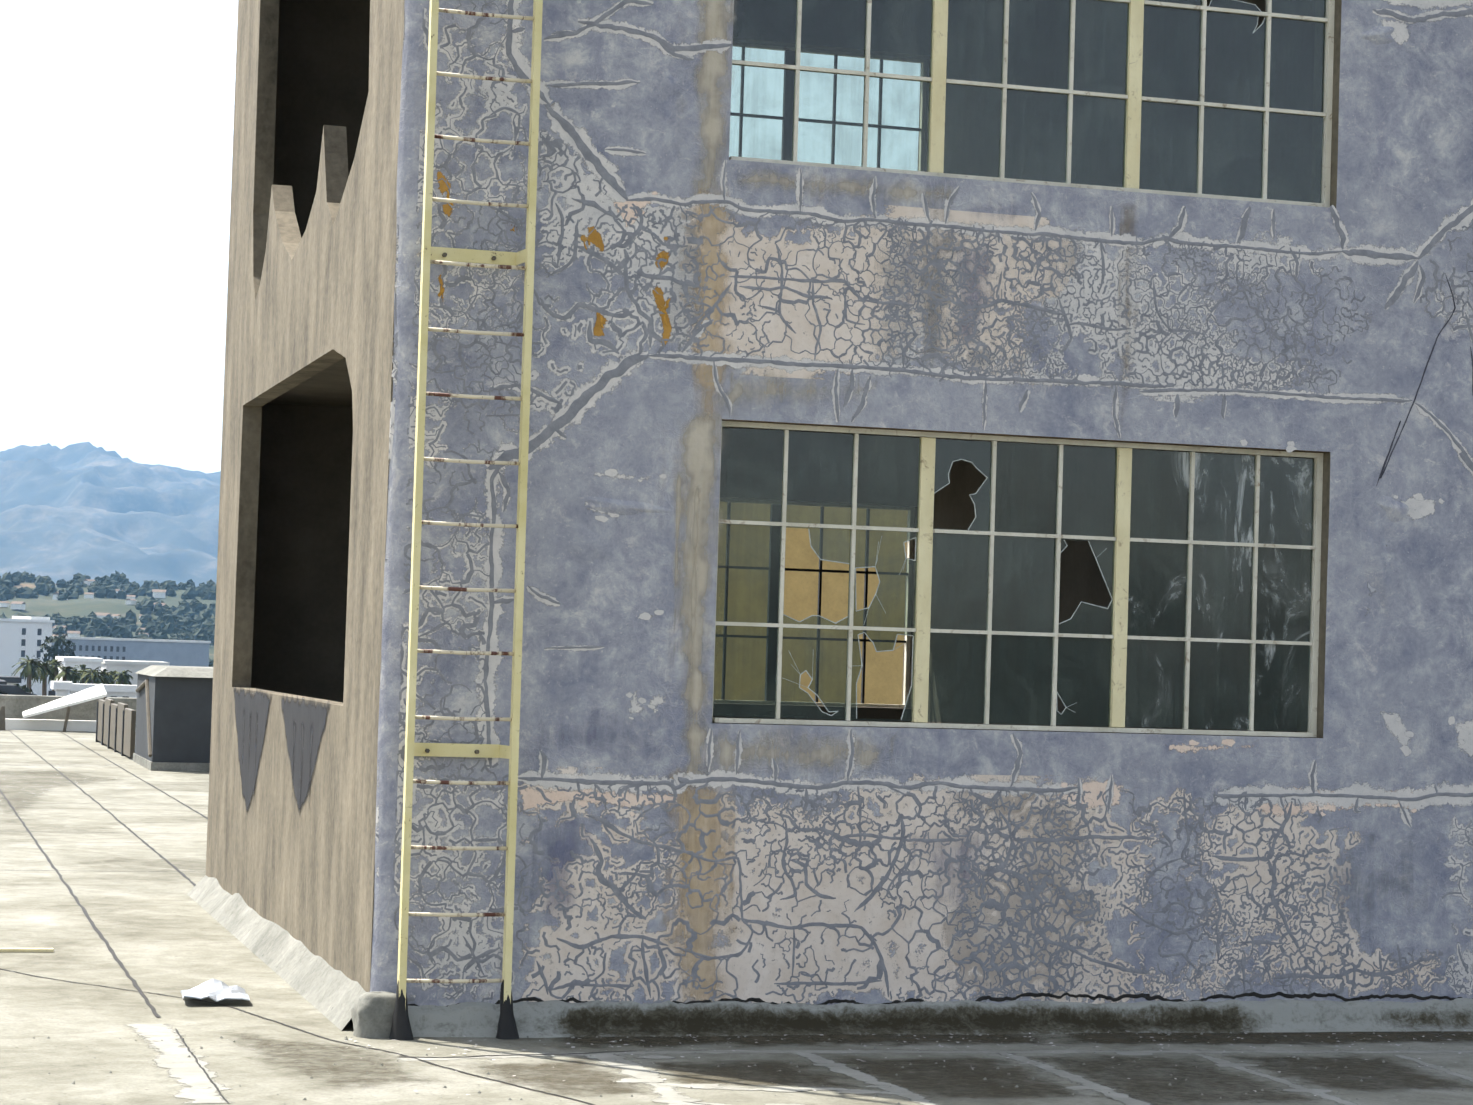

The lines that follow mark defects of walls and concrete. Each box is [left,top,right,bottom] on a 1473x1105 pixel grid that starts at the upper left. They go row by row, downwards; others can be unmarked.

peeling [1381,0,1473,45]
leakage [672,0,877,1000]
crack [376,0,1473,1007]
peeling [1380,711,1414,757]
peeling [1448,716,1473,759]
peeling [520,787,677,817]
peeling [1057,780,1121,809]
leakage [246,1031,1473,1105]